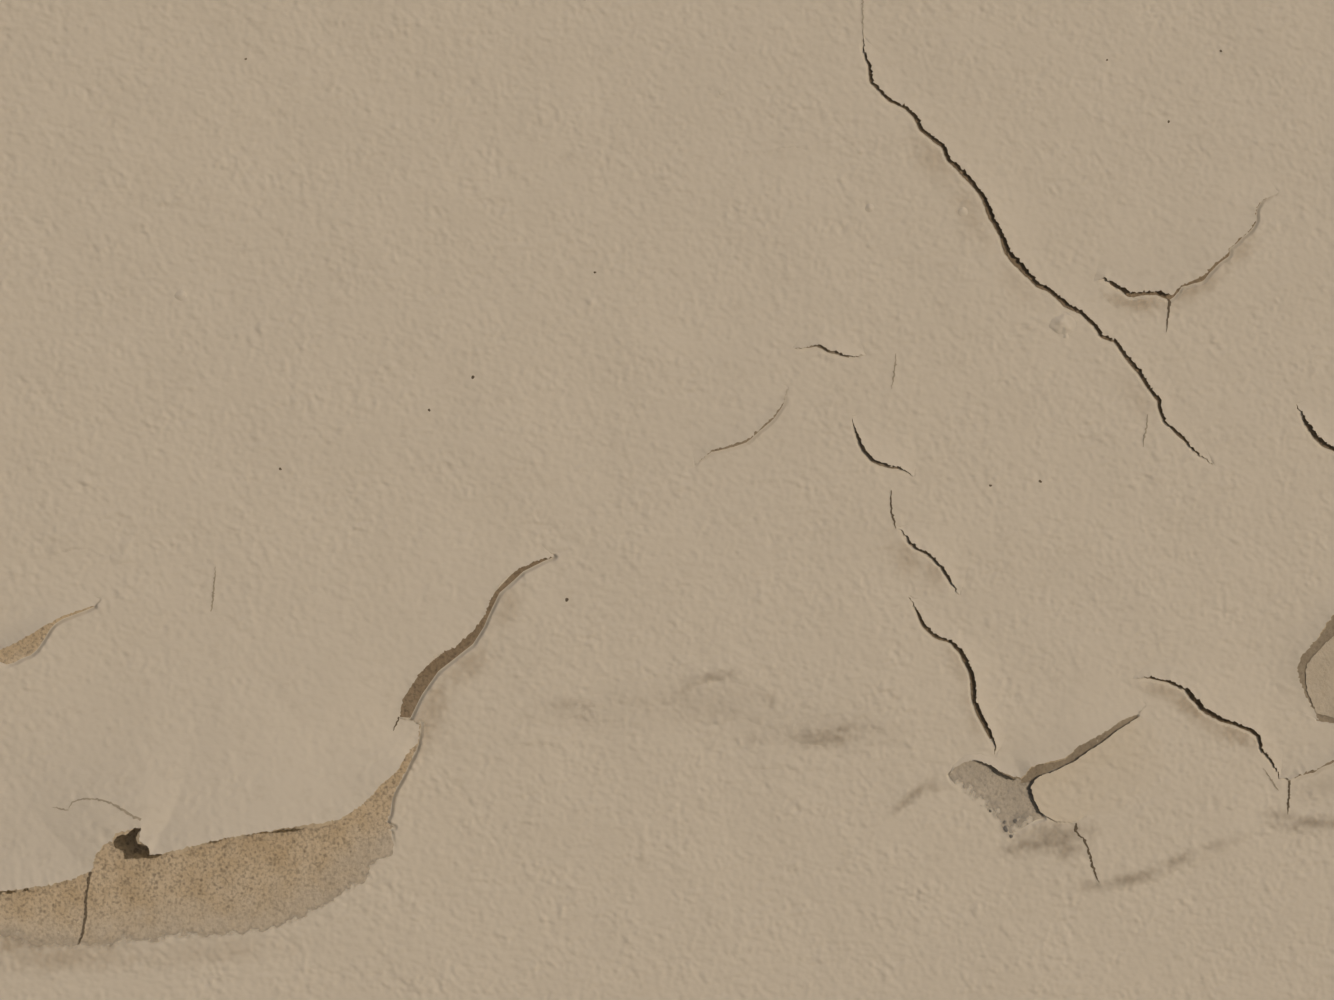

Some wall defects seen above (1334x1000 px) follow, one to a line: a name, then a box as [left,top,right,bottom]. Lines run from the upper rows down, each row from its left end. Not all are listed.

crack [861,0,1214,466]
peeling [0,525,555,946]
crack [890,490,968,595]
peeling [908,579,1334,880]